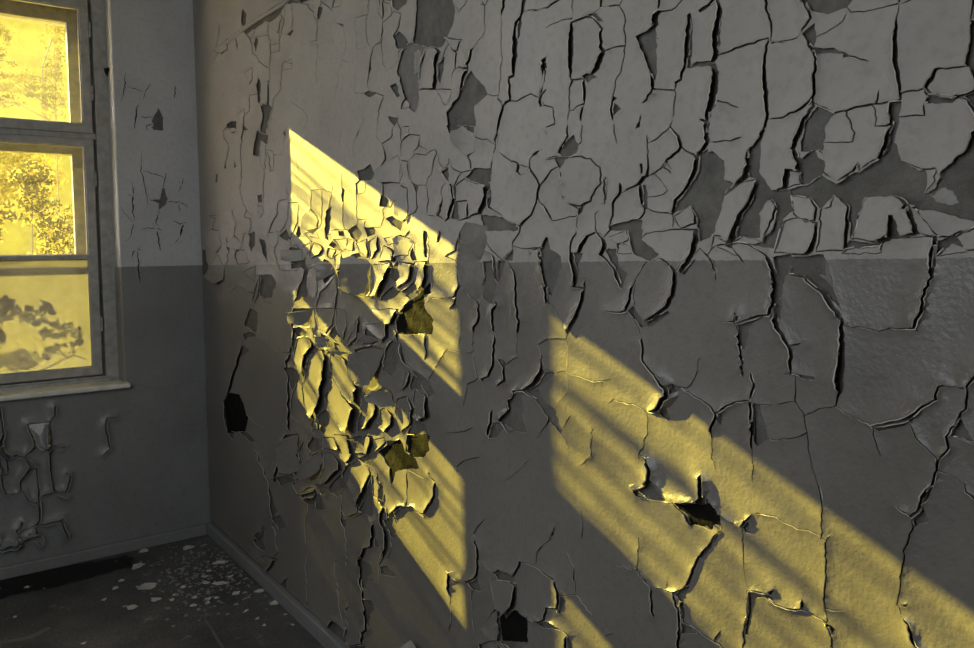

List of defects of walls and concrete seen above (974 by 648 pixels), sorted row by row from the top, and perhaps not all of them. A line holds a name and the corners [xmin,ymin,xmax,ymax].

peeling [244,6,285,83]
crack [119,72,190,284]
peeling [357,0,974,415]
flaking render [224,393,248,433]
peeling [267,199,435,582]
peeling [638,482,748,648]
crack [744,592,752,642]